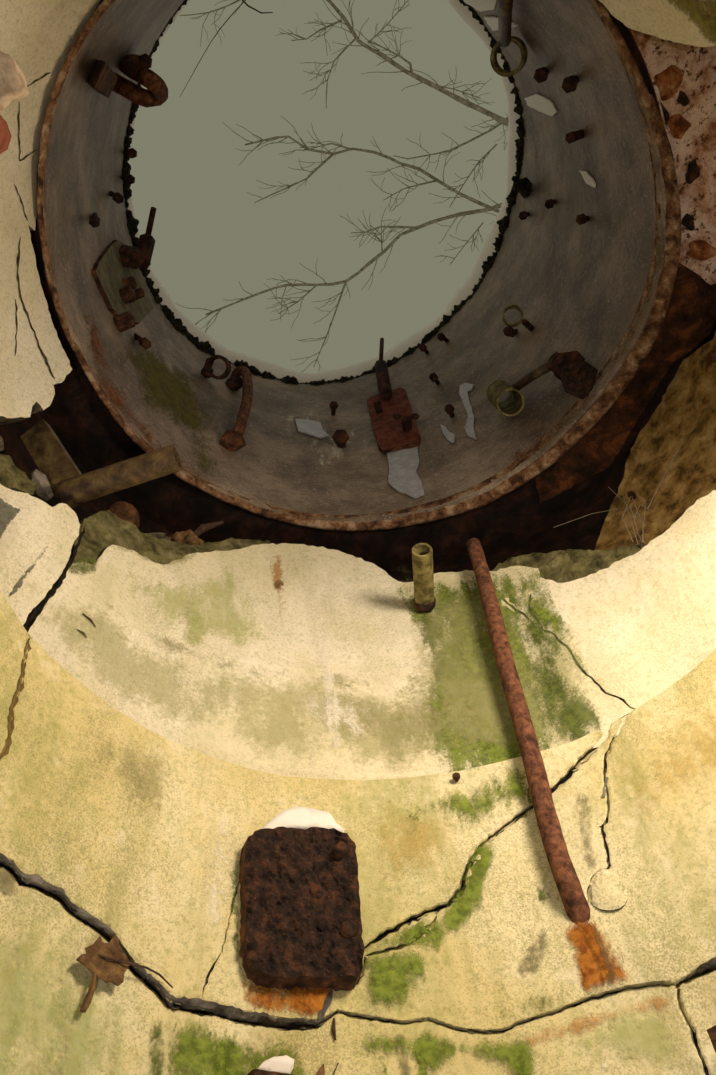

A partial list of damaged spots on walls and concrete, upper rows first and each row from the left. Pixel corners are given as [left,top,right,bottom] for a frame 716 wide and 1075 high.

rust [37,0,161,453]
rust [173,0,716,531]
flaking render [28,469,54,501]
spalling [66,510,270,566]
spalling [492,542,646,583]
crack [0,527,85,759]
damp [421,612,448,681]
damp [518,604,601,745]
crack [360,736,614,978]
crack [0,853,716,1075]
rust [567,921,626,991]
damp [150,1025,164,1075]